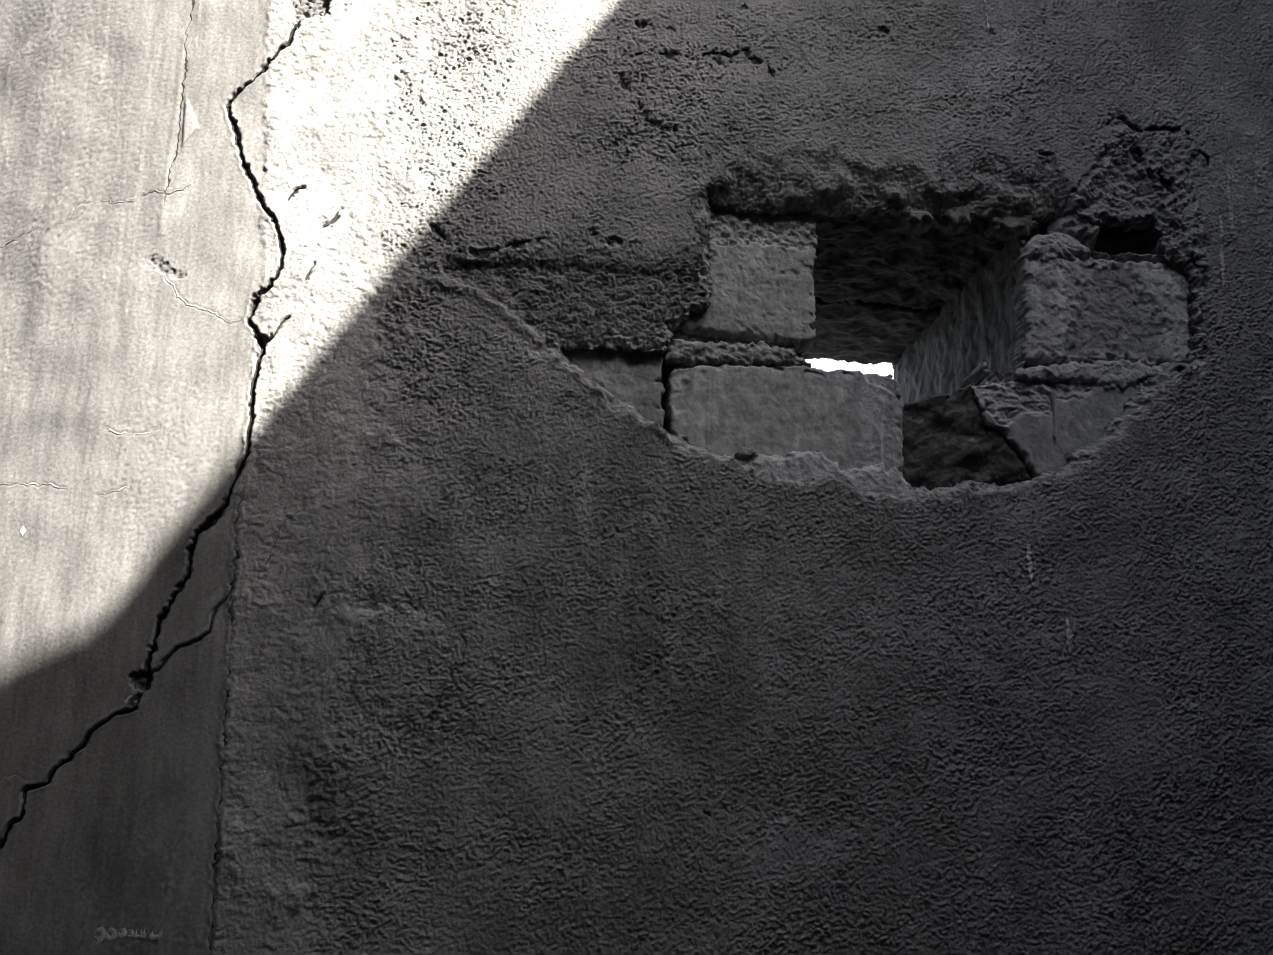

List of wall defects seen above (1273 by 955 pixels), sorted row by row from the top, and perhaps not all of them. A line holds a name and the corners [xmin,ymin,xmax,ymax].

crack [0,0,299,955]
flaking render [444,143,1210,506]